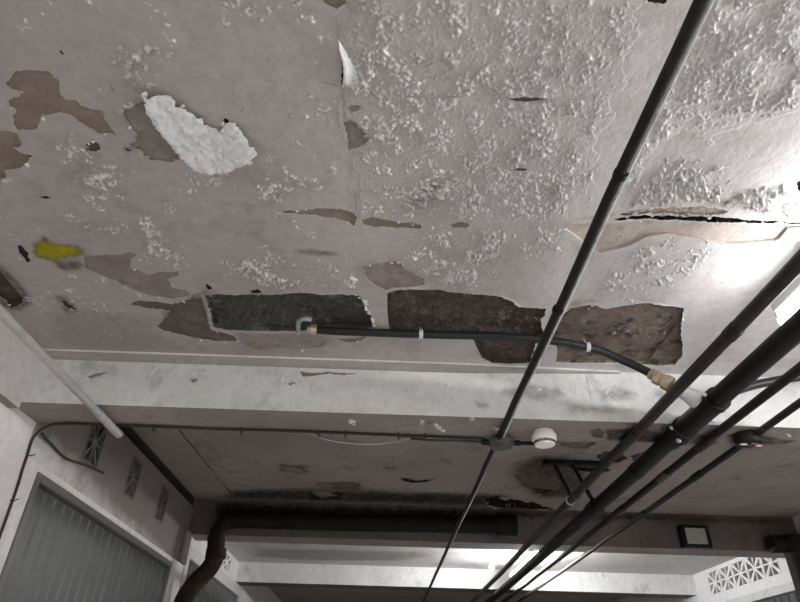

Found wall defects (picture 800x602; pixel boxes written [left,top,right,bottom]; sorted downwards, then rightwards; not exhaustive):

peeling [0,69,117,181]
peeling [121,90,180,163]
peeling [343,104,372,151]
peeling [282,208,423,230]
spalling [564,223,591,243]
spalling [593,205,800,253]
peeling [0,270,25,308]
spalling [82,252,375,352]
spalling [361,261,548,365]
spalling [553,303,685,366]
spalling [483,496,557,511]